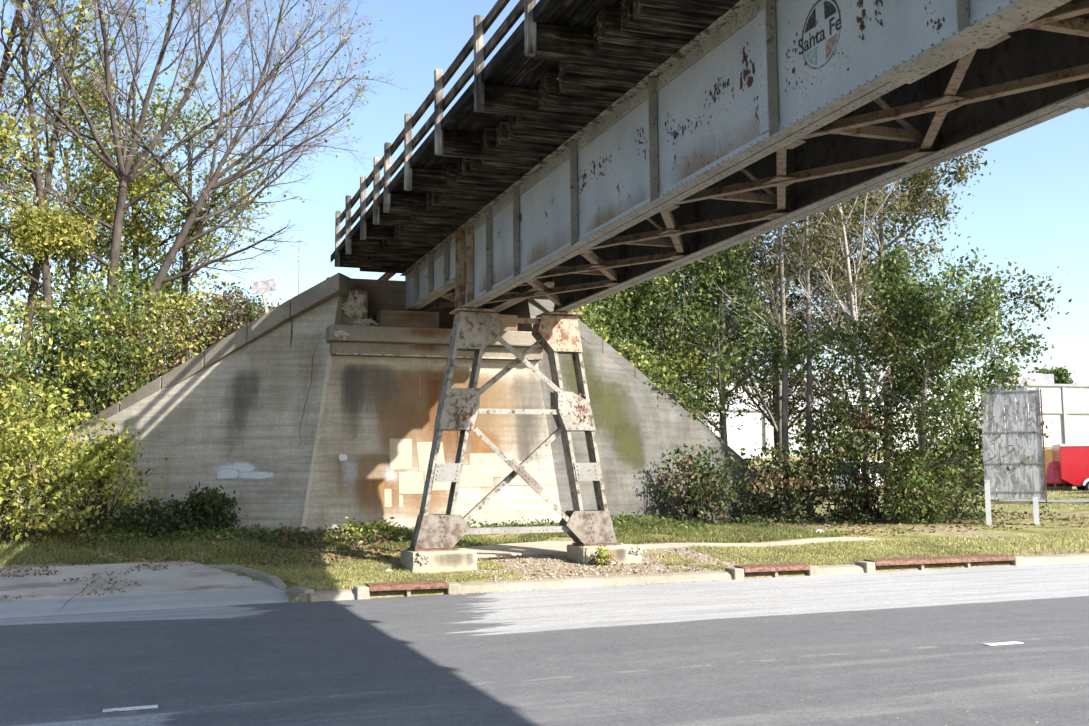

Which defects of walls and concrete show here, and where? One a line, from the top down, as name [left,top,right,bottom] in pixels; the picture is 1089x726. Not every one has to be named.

crack [294,333,321,446]
rust [388,370,507,455]